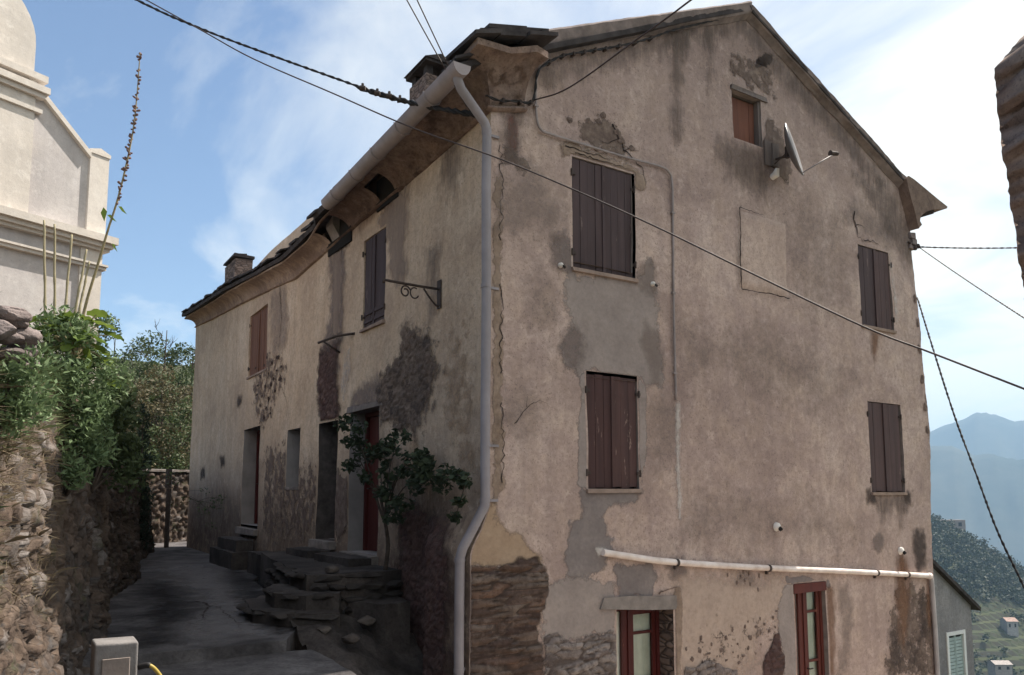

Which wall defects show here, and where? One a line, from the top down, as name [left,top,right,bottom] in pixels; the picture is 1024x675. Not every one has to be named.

peeling [730,52,776,99]
peeling [560,112,646,191]
peeling [253,352,287,430]
spalling [376,322,444,436]
peeling [261,439,317,544]
spalling [470,556,617,675]
peeling [674,570,786,675]
peeling [884,581,935,675]